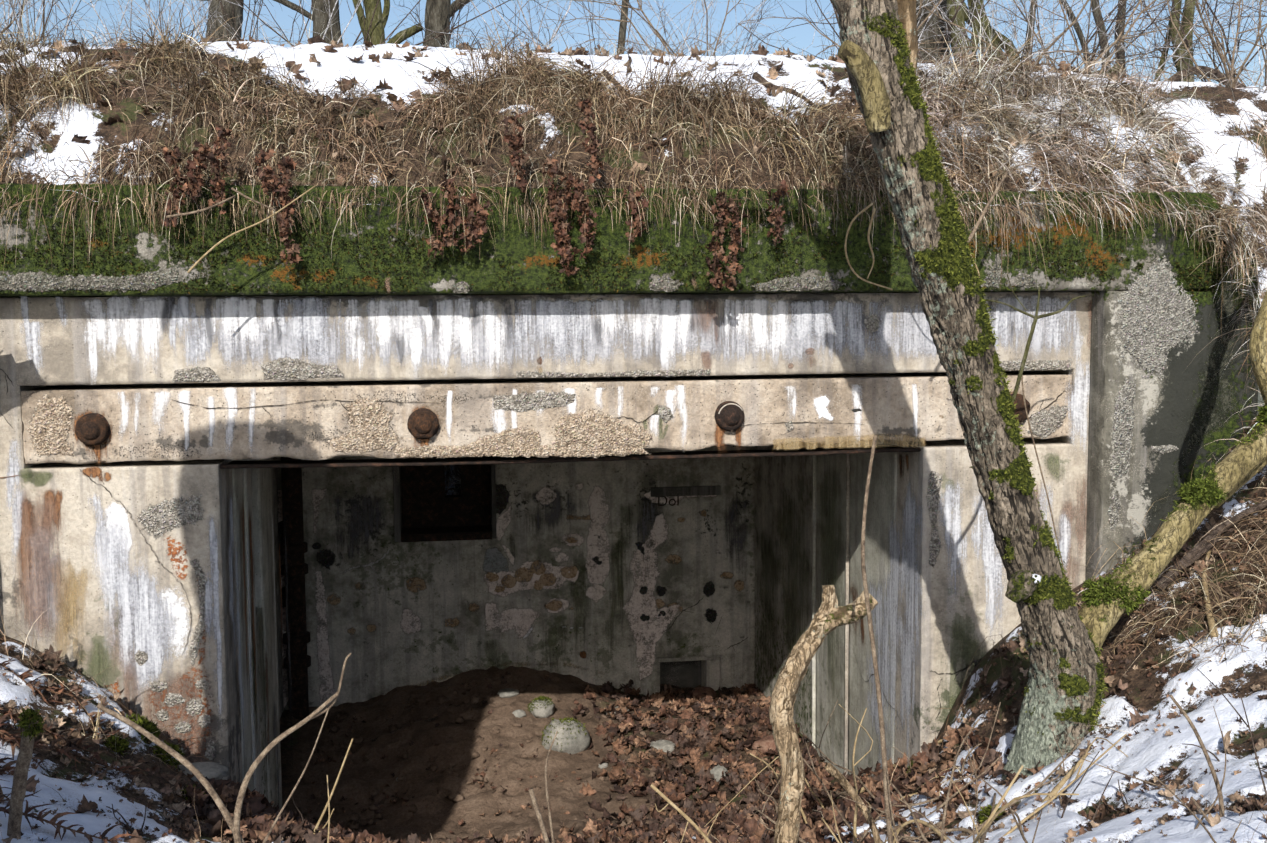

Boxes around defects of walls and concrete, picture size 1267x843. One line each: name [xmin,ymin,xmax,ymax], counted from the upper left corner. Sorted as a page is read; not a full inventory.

leakage [21,296,41,368]
corrosion [73,412,111,481]
leakage [84,296,937,374]
corrosion [715,425,742,448]
leakage [989,295,1090,443]
spalling [1108,255,1200,531]
corrosion [18,490,62,631]
leakage [33,496,189,708]
leakage [205,499,292,796]
peeling [623,491,717,680]
peeling [703,572,744,623]